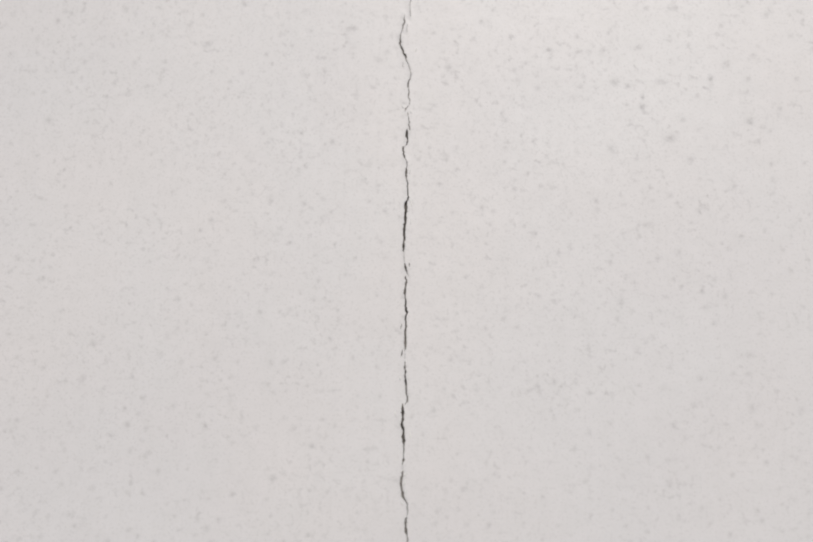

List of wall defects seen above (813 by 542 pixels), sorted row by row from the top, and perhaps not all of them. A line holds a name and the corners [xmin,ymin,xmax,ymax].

crack [395,0,417,542]